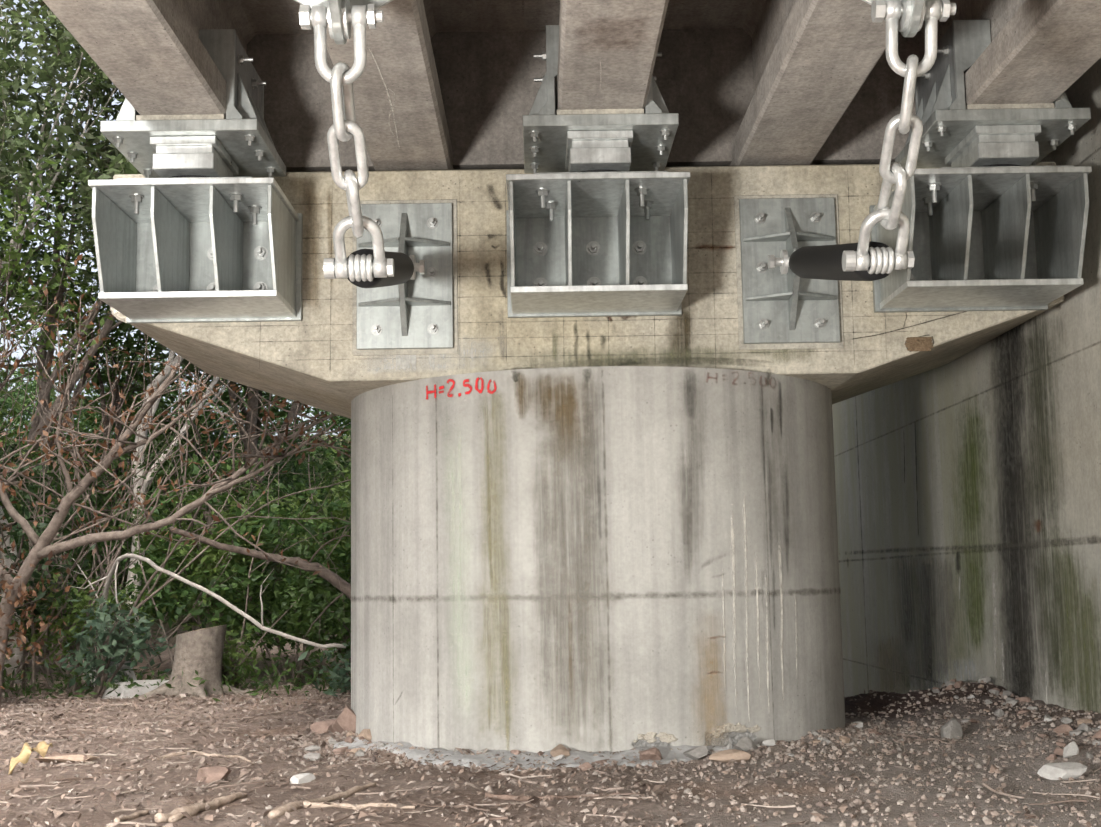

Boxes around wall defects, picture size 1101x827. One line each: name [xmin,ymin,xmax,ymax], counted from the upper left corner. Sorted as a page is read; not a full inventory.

damp [536,385,596,726]
damp [722,504,797,719]
damp [903,327,1072,697]